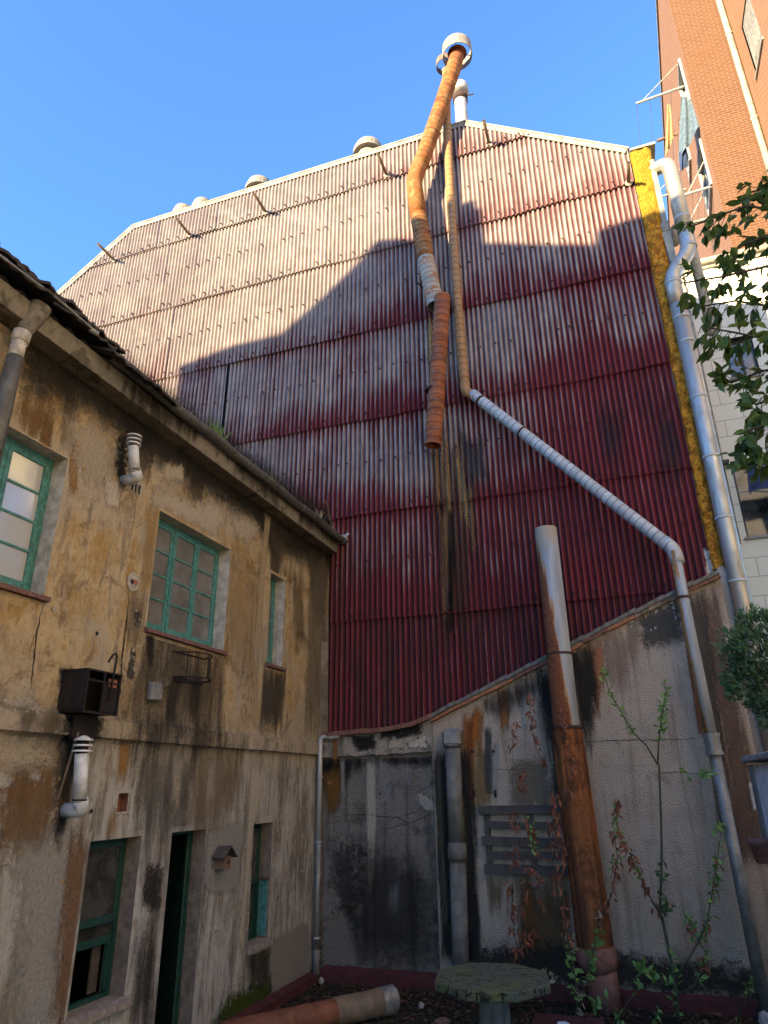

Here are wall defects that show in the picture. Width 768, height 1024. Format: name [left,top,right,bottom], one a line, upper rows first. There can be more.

corrosion [410,210,434,260]
crack [30,607,43,690]
corrosion [591,643,606,714]
corrosion [463,709,489,812]
leakage [0,764,66,866]
leakage [237,762,269,986]
leakage [333,724,437,966]
leakage [133,863,163,1023]